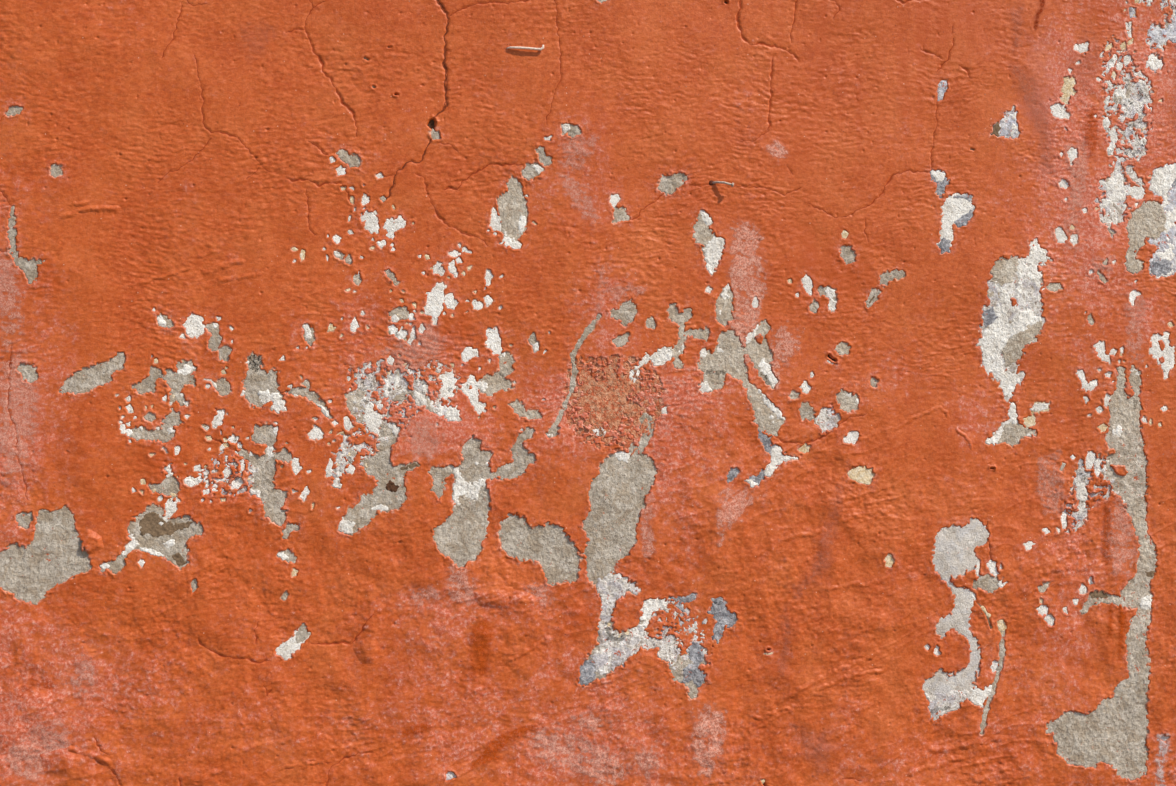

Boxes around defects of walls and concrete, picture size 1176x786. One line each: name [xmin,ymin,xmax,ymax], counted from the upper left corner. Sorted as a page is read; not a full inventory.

crack [160,0,358,235]
crack [383,0,562,246]
crack [736,0,799,141]
crack [737,101,938,242]
crack [921,27,970,77]
spalling [930,170,975,254]
peeling [1050,0,1176,306]
spalling [976,225,1078,448]
spalling [0,308,314,605]
spalling [308,210,811,699]
spalling [922,518,1008,722]
spalling [1036,322,1175,781]